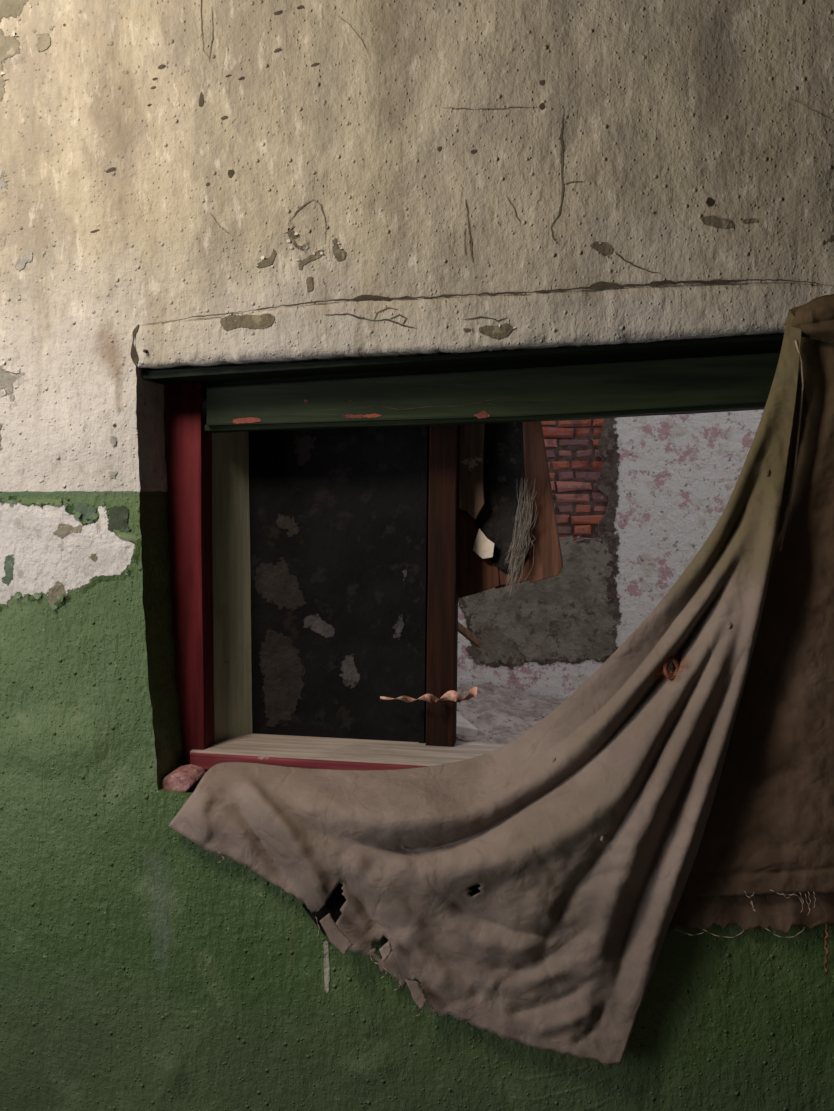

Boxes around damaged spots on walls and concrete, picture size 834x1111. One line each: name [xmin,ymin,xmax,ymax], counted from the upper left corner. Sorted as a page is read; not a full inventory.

peeling [0,0,51,108]
crack [448,104,535,112]
crack [291,199,326,243]
crack [550,111,583,244]
crack [130,252,824,367]
peeling [0,360,27,411]
peeling [0,495,141,611]
peeling [458,418,622,670]